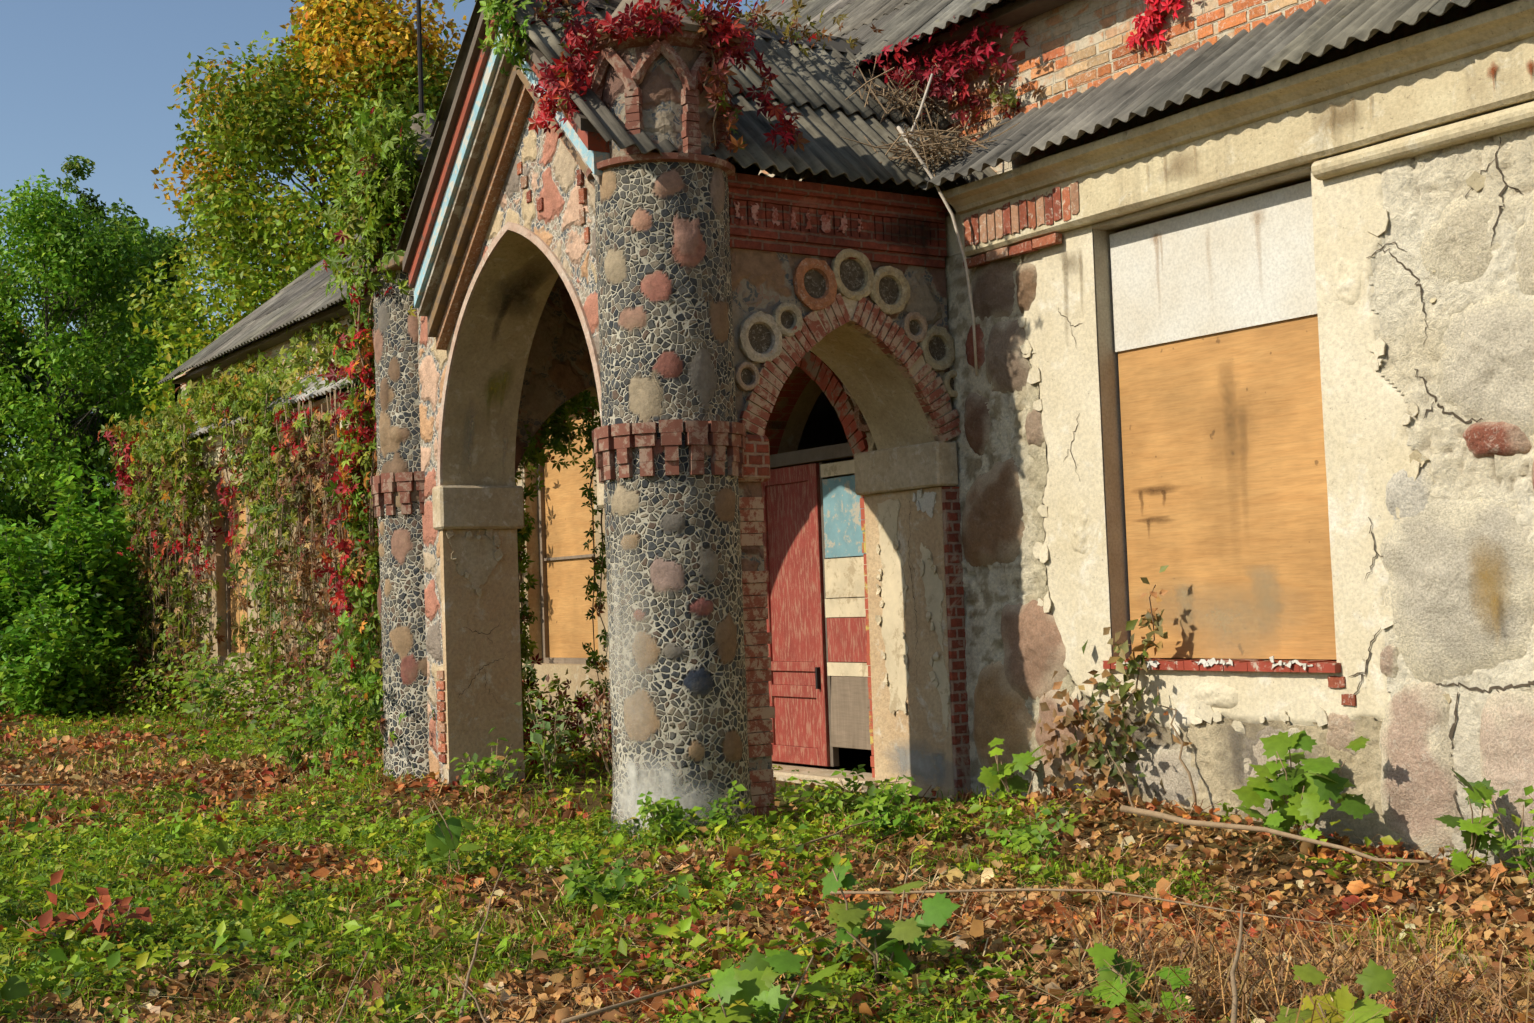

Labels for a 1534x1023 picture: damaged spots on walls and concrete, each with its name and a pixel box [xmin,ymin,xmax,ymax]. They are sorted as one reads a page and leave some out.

crack [1465,137,1523,245]
crack [1366,242,1486,424]
flaking render [875,126,1534,868]
crack [1349,628,1381,695]